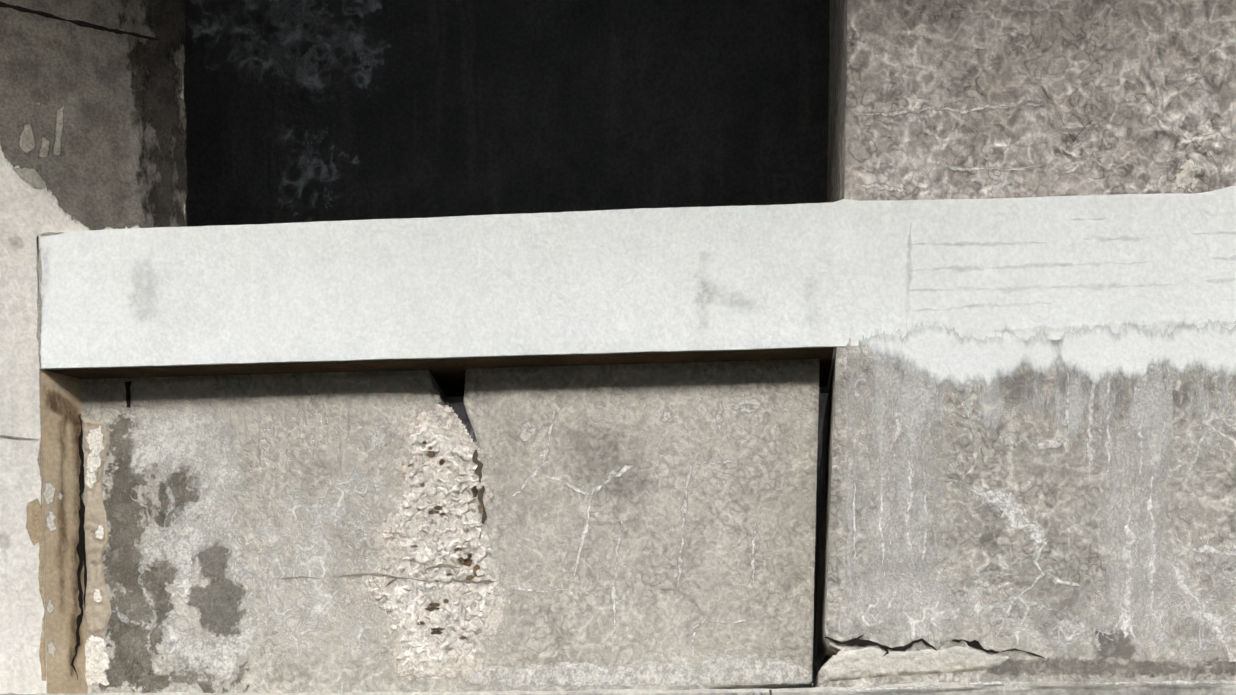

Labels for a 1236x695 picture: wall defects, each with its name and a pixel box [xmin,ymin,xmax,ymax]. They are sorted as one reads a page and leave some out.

water stain [0,0,188,230]
crack [0,433,39,441]
rust [27,442,46,680]
rust [48,391,81,675]
crack [71,414,87,680]
water stain [112,404,386,693]
spalling [335,390,511,686]
crack [279,411,634,593]
crack [611,521,622,662]
crack [654,460,747,657]
crack [749,520,757,588]
water stain [829,338,1236,678]